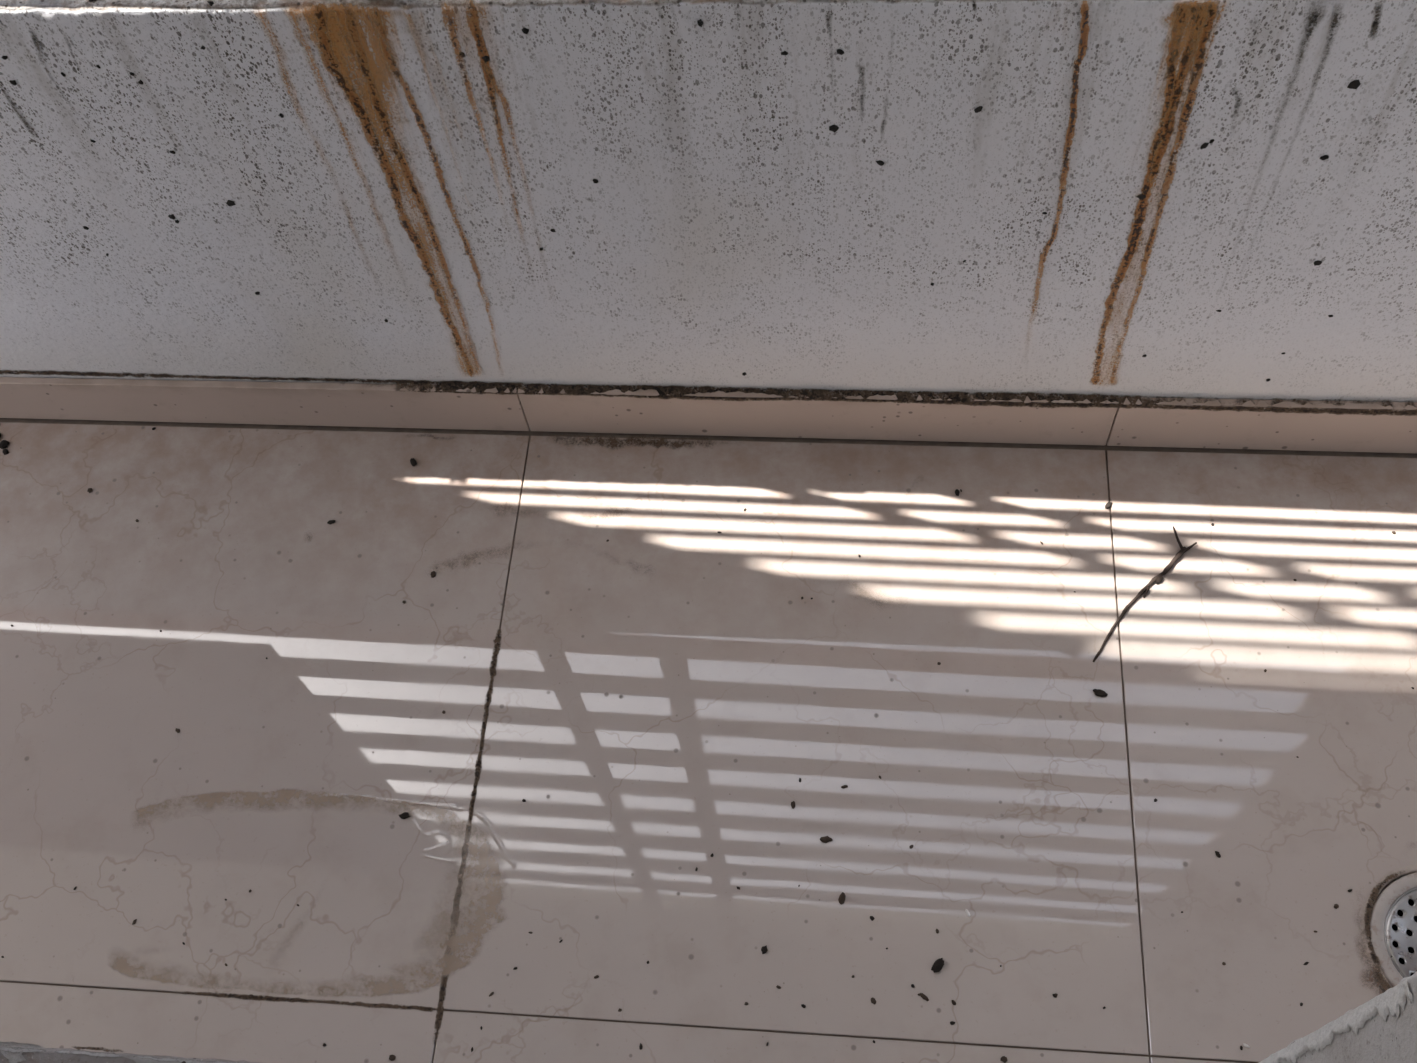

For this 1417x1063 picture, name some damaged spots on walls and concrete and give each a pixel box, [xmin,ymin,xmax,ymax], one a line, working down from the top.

rust [289,3,499,377]
rust [442,0,518,216]
rust [1032,0,1089,313]
rust [1090,0,1224,385]
damp [112,957,229,988]
damp [137,789,504,996]